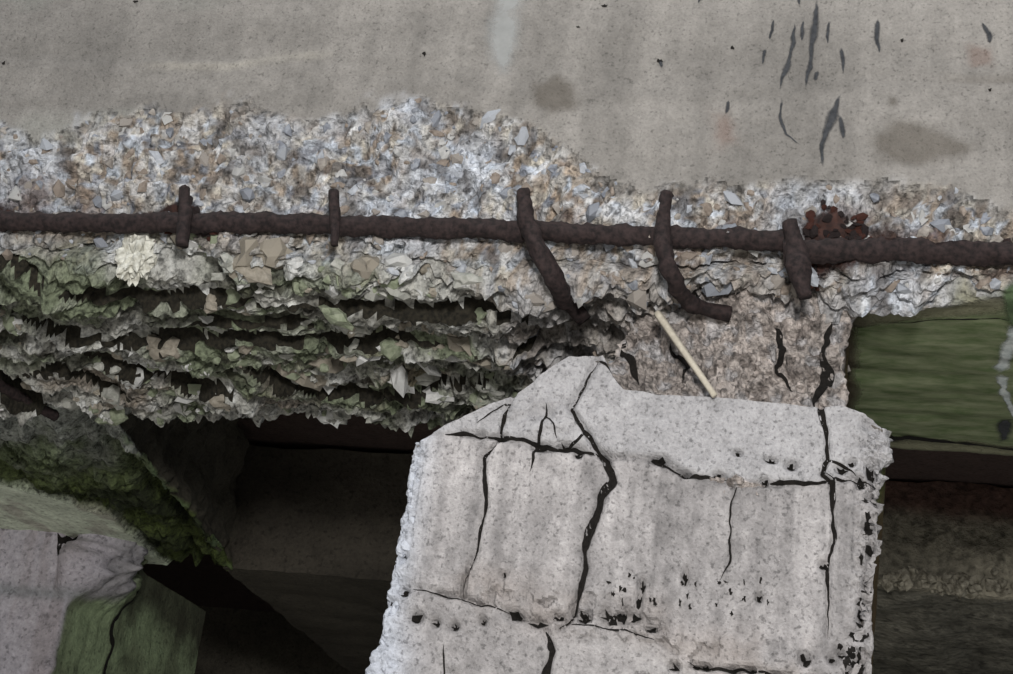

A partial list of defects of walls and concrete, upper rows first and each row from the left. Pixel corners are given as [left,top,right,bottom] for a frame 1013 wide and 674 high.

corrosion [157,195,200,214]
spalling [0,95,1013,243]
corrosion [811,260,860,292]
corrosion [802,199,895,240]
crack [669,343,690,383]
crack [0,254,660,674]
spalling [0,230,1013,674]
crack [660,463,737,578]
crack [768,323,875,629]
crack [689,662,771,674]